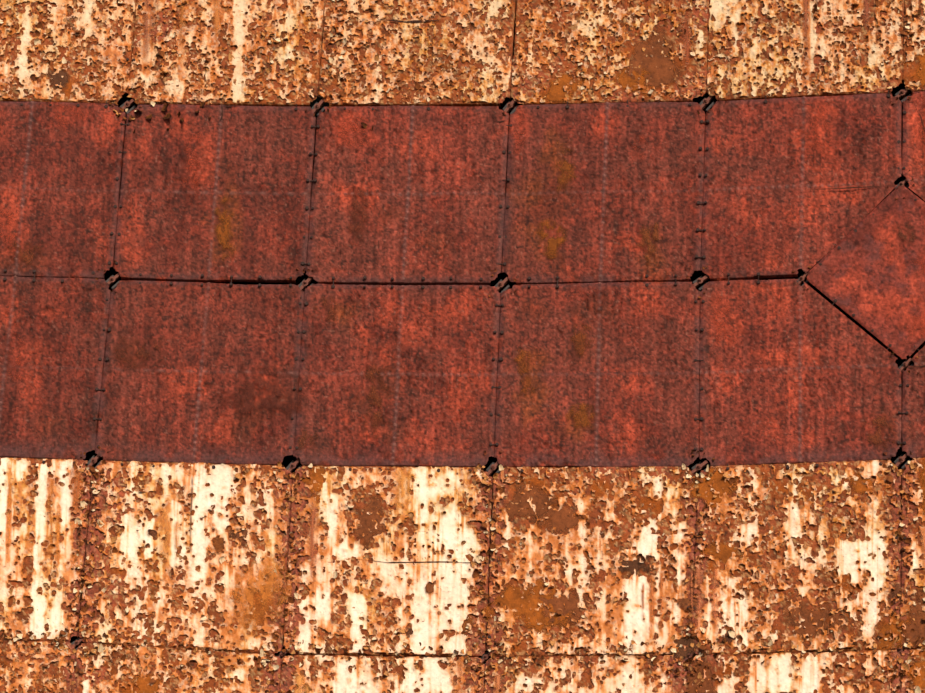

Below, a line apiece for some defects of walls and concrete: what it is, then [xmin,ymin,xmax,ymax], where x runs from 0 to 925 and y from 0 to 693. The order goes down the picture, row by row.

rust [47,69,69,89]
peeling [0,0,925,132]
rust [615,17,690,94]
rust [302,467,325,568]
rust [353,496,386,548]
rust [505,481,582,538]
peeling [0,444,925,693]
rust [481,580,589,634]
rust [613,556,662,617]
rust [784,598,847,643]
rust [877,590,925,650]
rust [667,633,716,693]